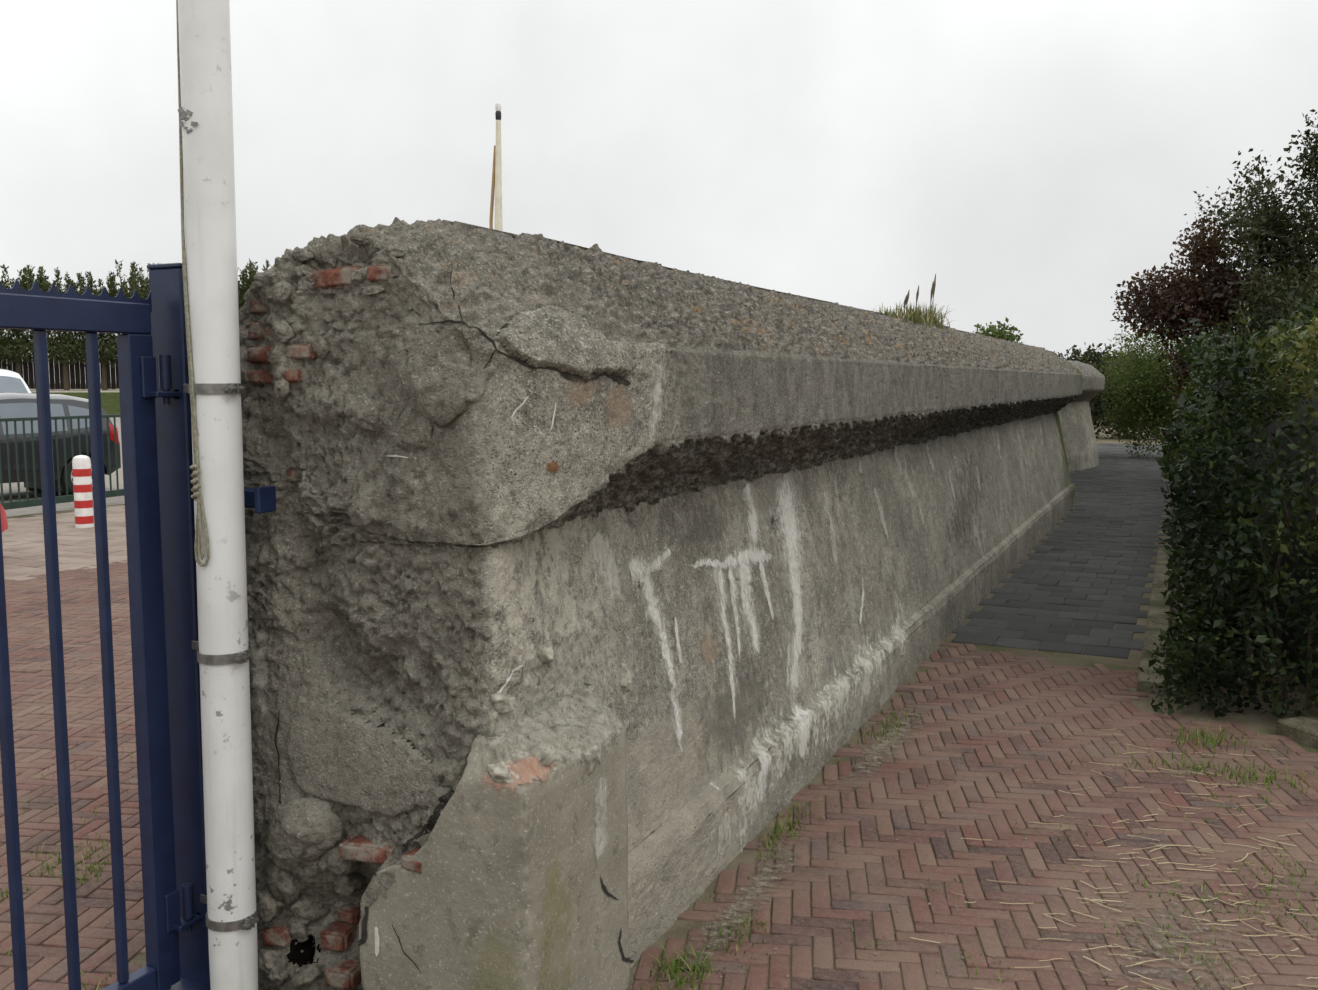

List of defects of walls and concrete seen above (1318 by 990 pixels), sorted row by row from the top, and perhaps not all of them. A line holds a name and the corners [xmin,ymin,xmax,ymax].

spalling [244,232,407,421]
crack [418,265,631,386]
spalling [255,696,443,990]